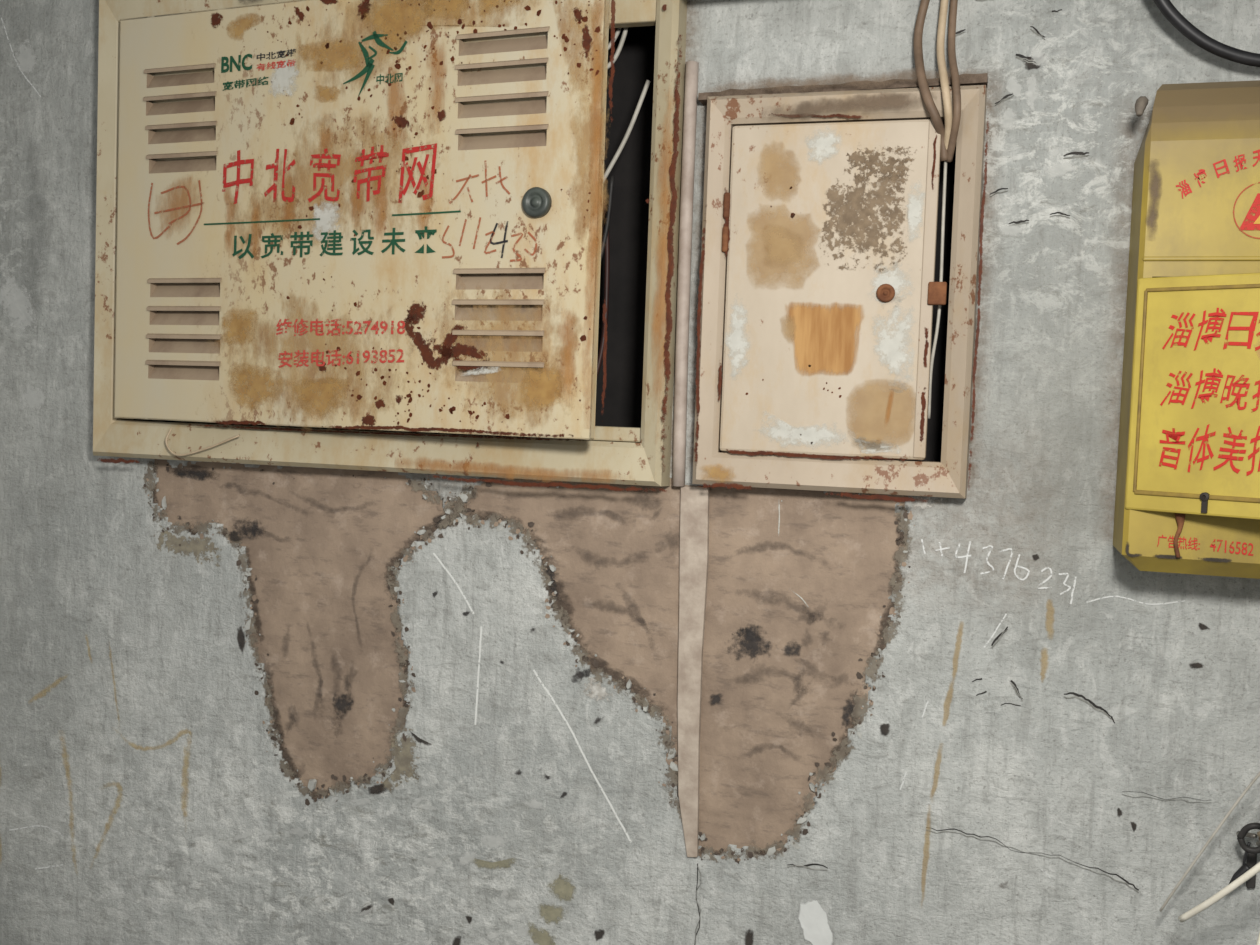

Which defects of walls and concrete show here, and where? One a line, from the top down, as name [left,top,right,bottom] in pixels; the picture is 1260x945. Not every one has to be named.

spalling [142,459,943,867]
crack [926,827,1139,893]